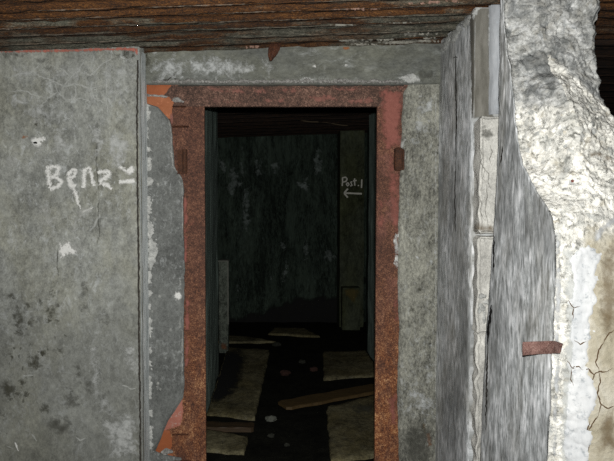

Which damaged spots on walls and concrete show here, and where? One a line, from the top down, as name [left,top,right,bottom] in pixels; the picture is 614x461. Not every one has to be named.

corrosion [268,43,281,61]
spalling [147,85,184,123]
crack [567,330,614,451]
efflorescence [103,415,137,456]
spalling [156,401,183,456]